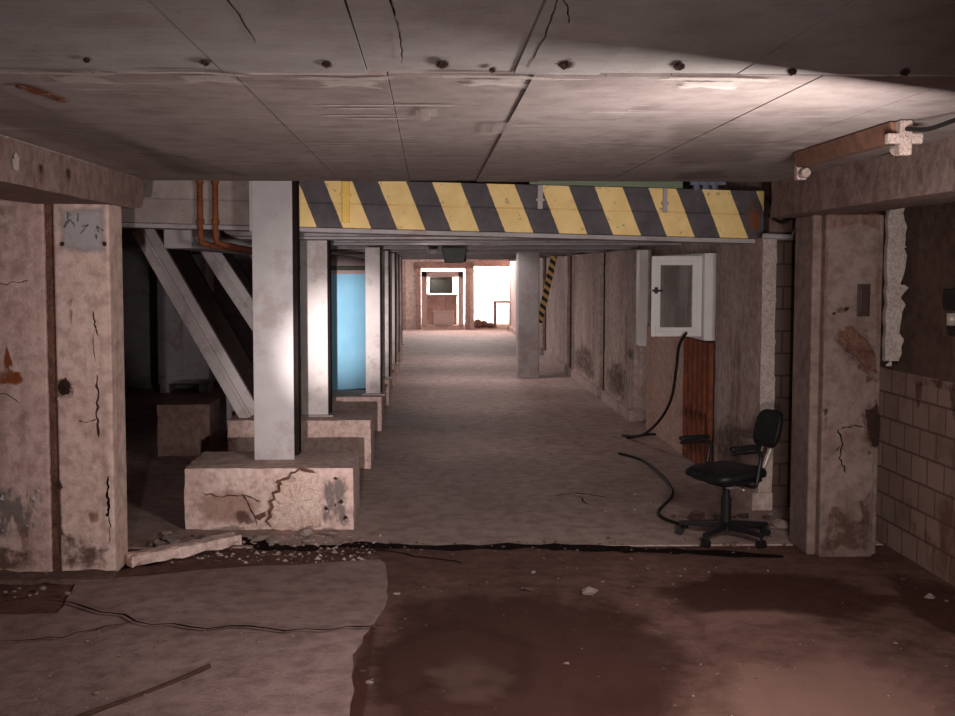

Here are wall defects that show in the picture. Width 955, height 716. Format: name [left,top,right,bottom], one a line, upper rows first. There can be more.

crack [227,0,256,43]
crack [389,0,403,63]
crack [528,0,570,67]
corrosion [15,84,68,103]
flaking render [837,207,909,383]
corrosion [0,347,22,384]
crack [204,493,784,563]
crack [120,558,174,570]
crack [12,600,382,641]